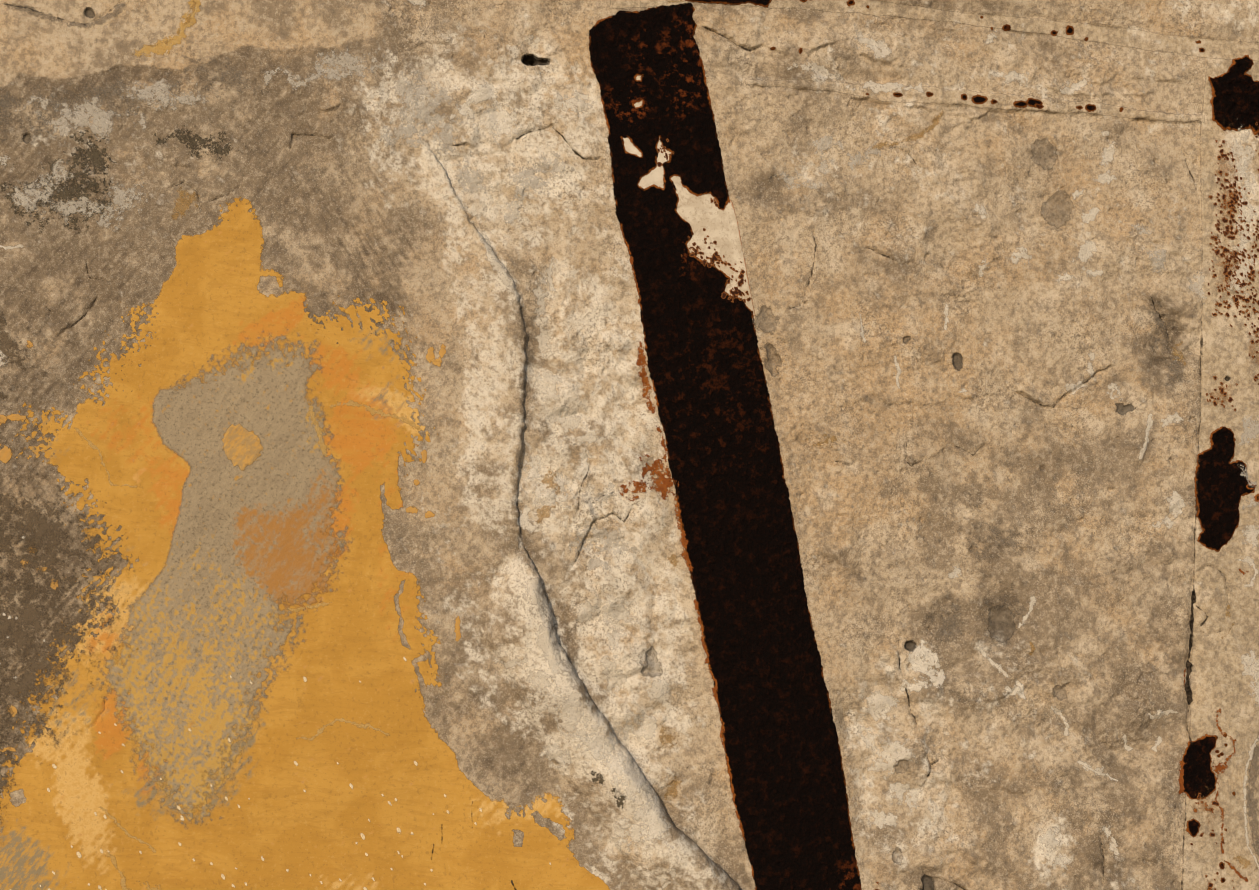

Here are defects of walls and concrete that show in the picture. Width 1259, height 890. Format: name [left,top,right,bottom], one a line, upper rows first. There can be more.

rust [961,94,998,104]
rust [1013,98,1044,109]
rust [1051,25,1088,41]
rust [1208,55,1259,358]
peeling [0,197,610,890]
rust [589,0,879,890]
crack [1185,322,1221,742]
rust [1206,376,1238,411]
rust [1194,426,1259,552]
rust [1178,709,1248,890]